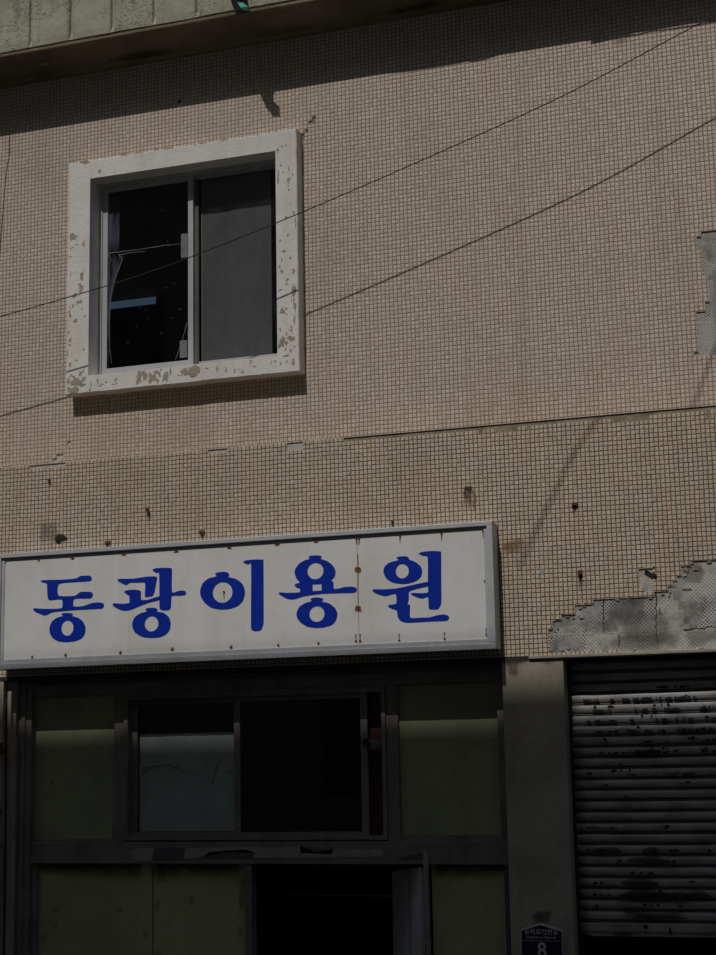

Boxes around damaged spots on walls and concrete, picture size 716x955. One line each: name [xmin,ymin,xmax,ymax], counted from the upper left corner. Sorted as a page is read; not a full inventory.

peeling [67,270,117,393]
peeling [136,360,256,384]
spalling [546,560,716,653]